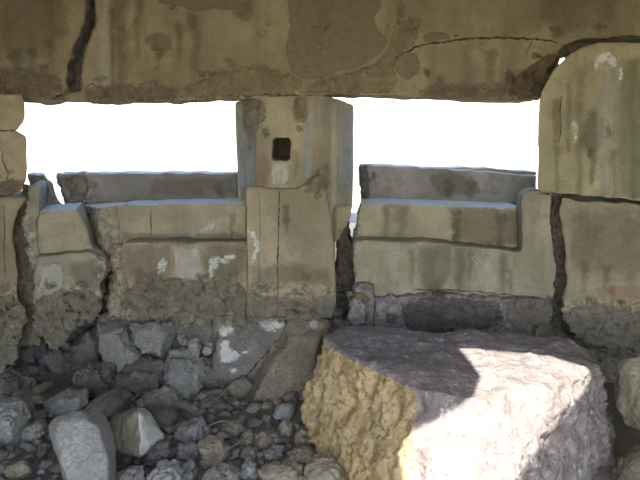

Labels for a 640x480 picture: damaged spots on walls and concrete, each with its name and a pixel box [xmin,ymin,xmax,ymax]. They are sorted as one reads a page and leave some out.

crack [50,0,100,99]
spalling [425,53,558,99]
crack [395,35,640,59]
damp [594,52,624,80]
damp [208,255,235,277]
crack [277,192,285,300]
crack [335,215,353,311]
crack [412,192,577,334]
spalling [0,279,102,366]
spalling [119,272,338,328]
spalling [385,290,554,336]